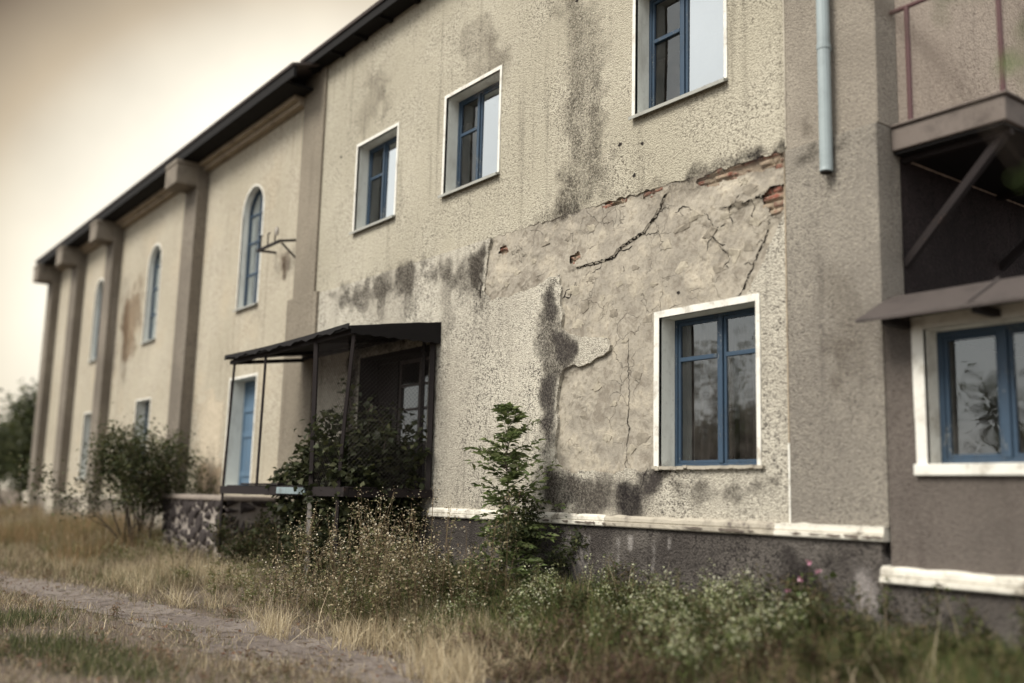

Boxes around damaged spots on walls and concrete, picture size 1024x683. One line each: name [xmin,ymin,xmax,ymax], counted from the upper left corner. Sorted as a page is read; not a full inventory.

leakage [339,248,486,309]
leakage [537,286,578,454]
peeling [485,151,784,474]
crack [624,338,648,487]
crack [562,178,770,299]
leakage [544,470,664,516]